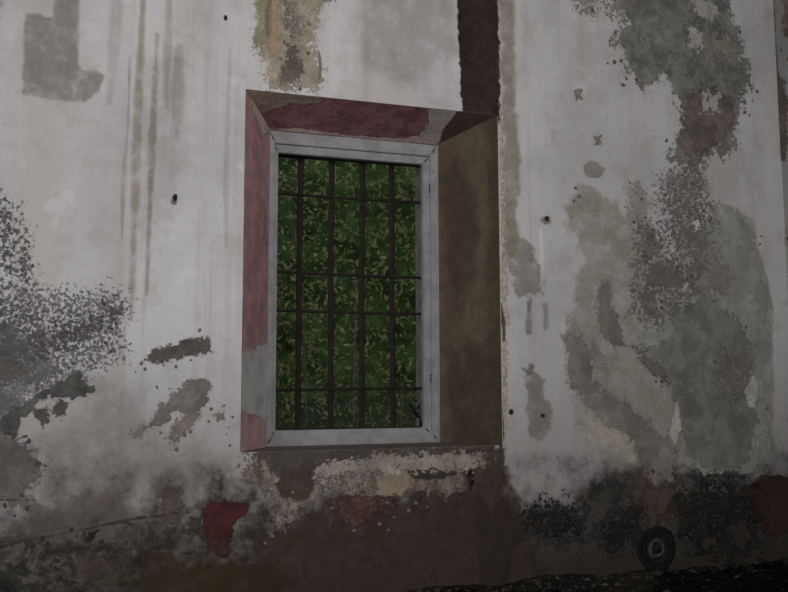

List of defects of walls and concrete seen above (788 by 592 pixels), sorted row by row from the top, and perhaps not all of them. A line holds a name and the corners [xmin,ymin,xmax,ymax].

flaking render [0,188,212,517]
peeling [127,0,520,545]
water stain [584,161,605,177]
water stain [561,186,682,488]
flaking render [512,0,788,559]
water stain [737,210,774,460]
water stain [29,490,161,551]
peeling [154,484,249,559]